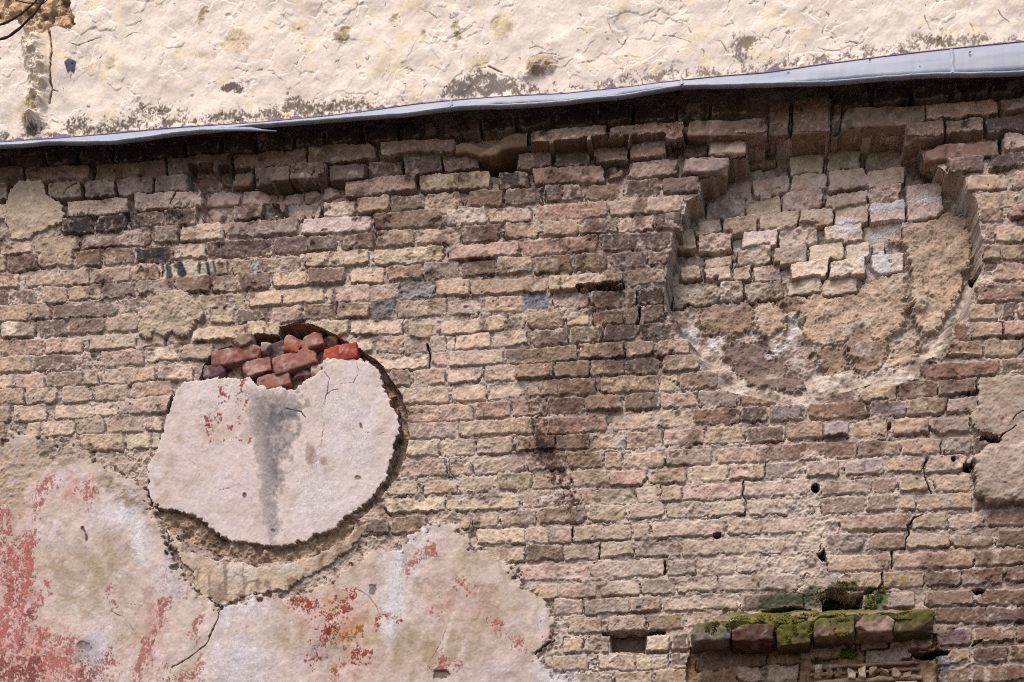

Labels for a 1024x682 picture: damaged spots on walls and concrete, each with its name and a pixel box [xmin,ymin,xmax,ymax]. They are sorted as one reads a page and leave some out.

leakage [0,95,373,140]
spalling [192,170,346,225]
spalling [665,130,983,406]
leakage [260,399,296,474]
spalling [822,599,860,612]
spalling [603,633,665,654]